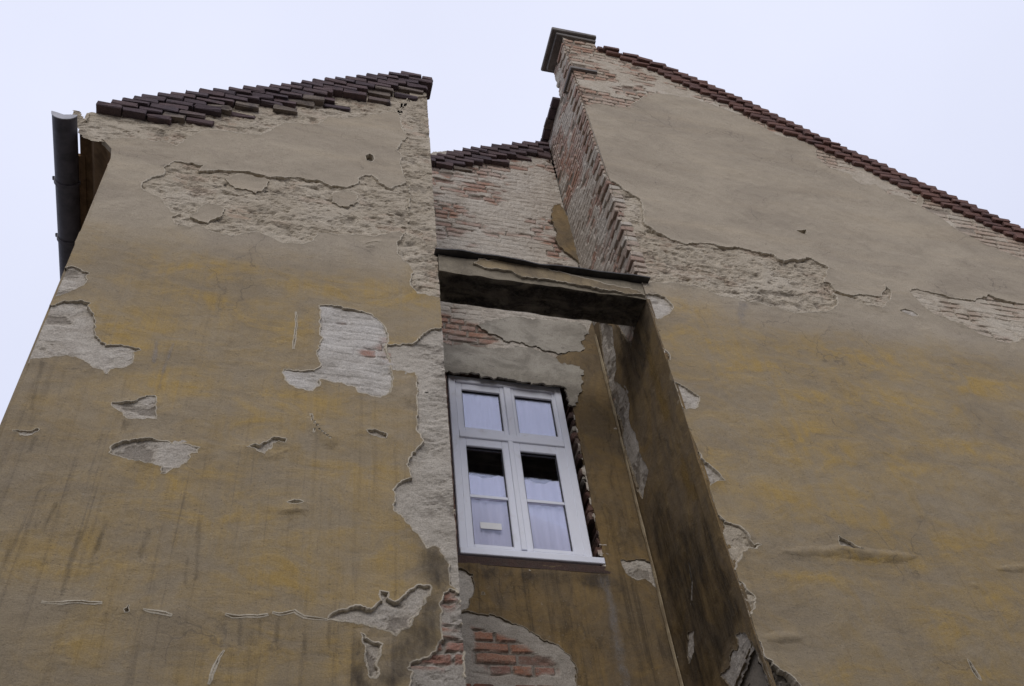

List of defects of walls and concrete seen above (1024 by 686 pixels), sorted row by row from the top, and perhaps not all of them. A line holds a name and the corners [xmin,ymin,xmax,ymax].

peeling [28,266,141,374]
flaking render [72,90,440,298]
flaking render [473,179,1024,343]
flaking render [563,38,1024,260]
peeling [111,395,157,419]
peeling [108,437,200,474]
spalling [282,304,587,686]
peeling [599,323,649,500]
peeling [620,559,657,590]
spalling [718,515,763,570]